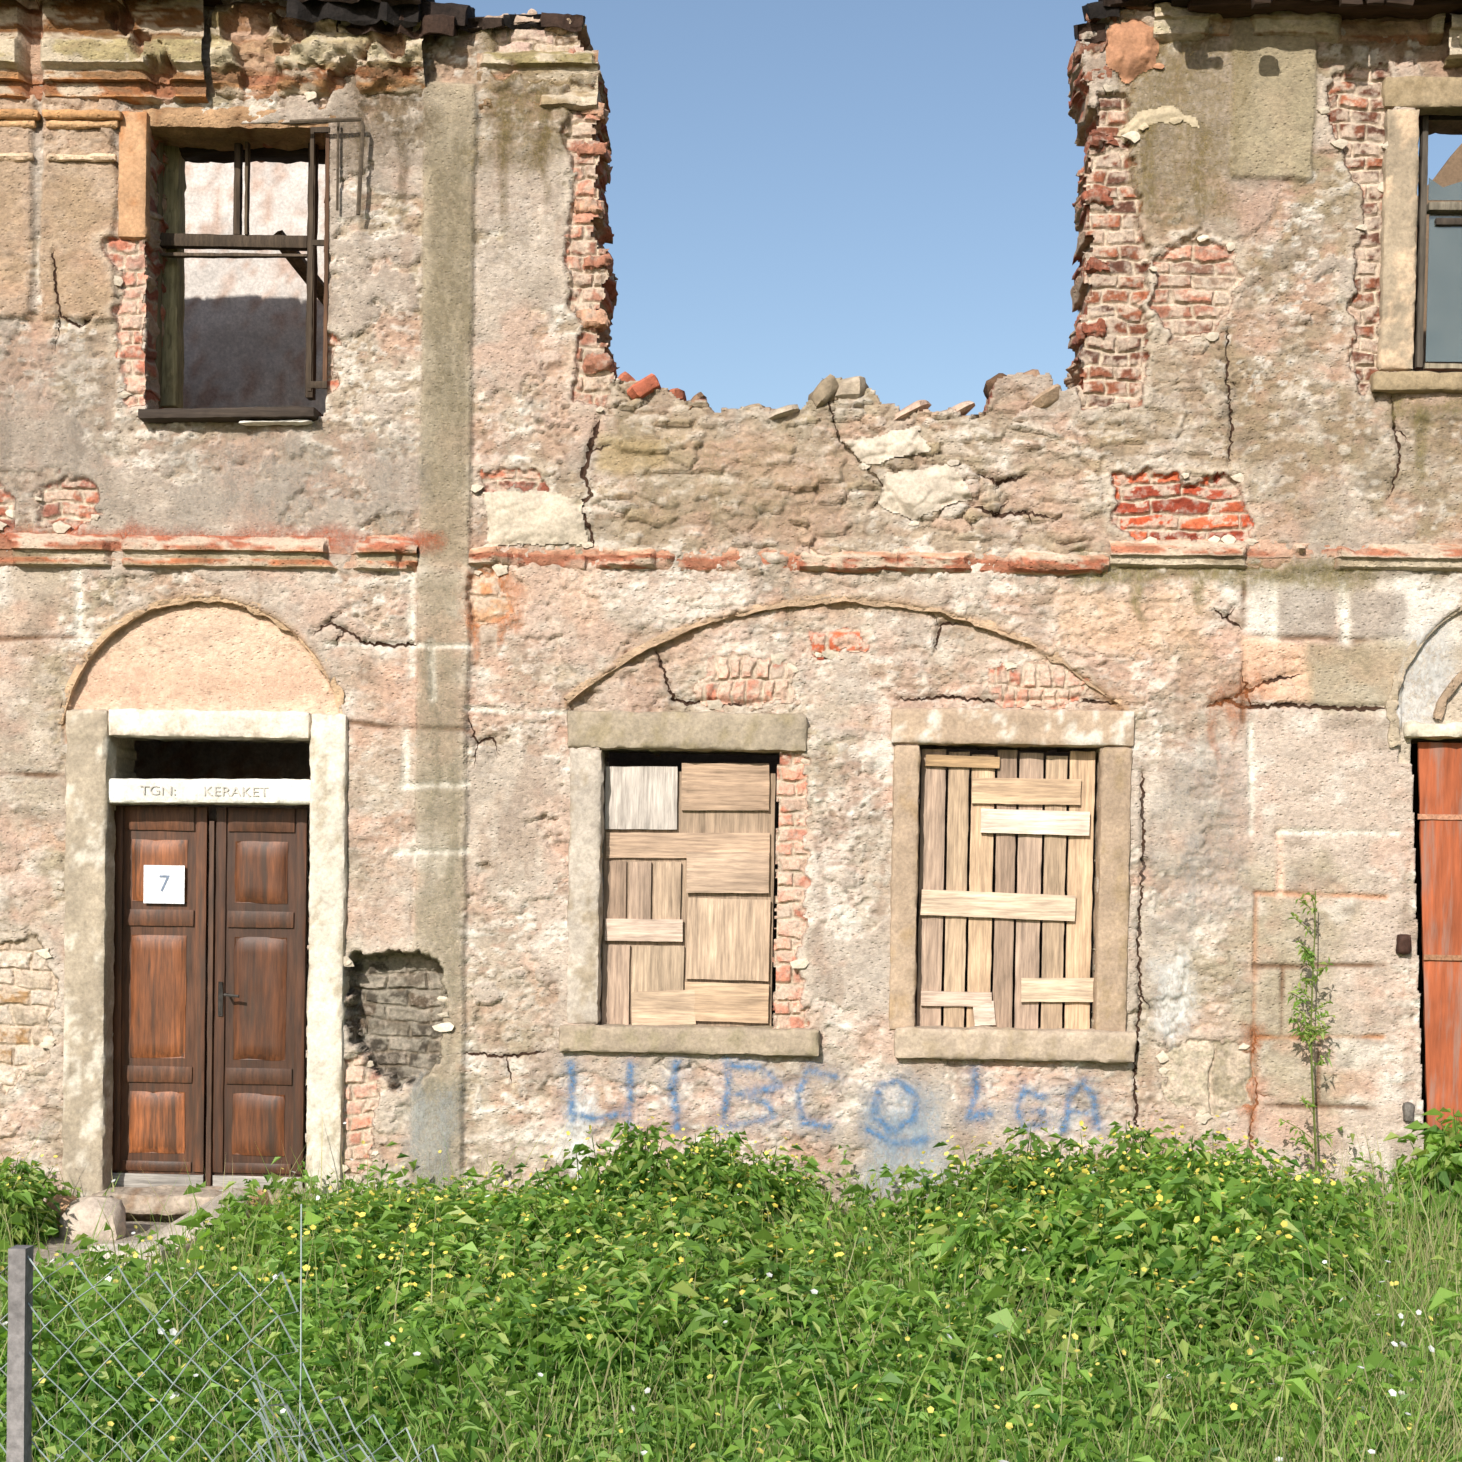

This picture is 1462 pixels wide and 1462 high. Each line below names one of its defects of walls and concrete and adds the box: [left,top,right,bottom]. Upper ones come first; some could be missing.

spalling [491,25,585,52]
spalling [550,79,614,416]
spalling [1076,84,1245,411]
spalling [1317,62,1393,395]
crack [580,419,611,545]
crack [822,378,883,508]
spalling [1111,466,1259,546]
crack [656,650,743,706]
spalling [694,649,801,712]
spalling [988,660,1089,710]
spalling [772,752,811,1029]
spalling [342,950,454,1183]